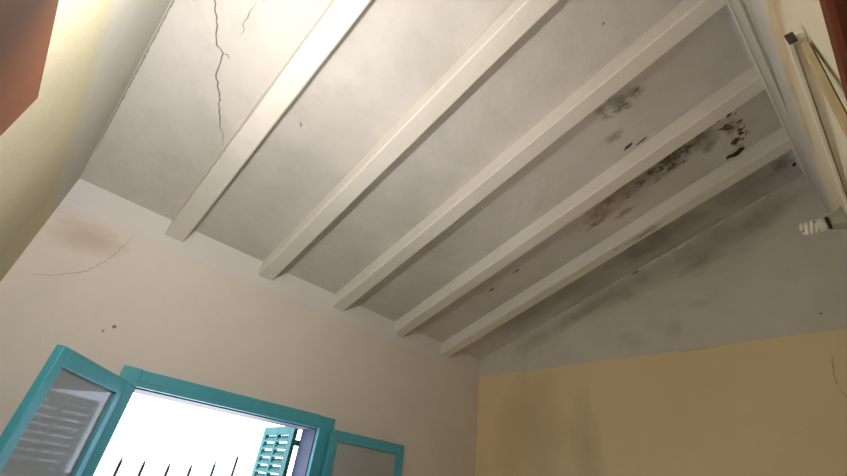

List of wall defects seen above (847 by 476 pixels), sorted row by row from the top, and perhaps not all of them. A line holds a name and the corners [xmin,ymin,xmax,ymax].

crack [95,0,175,151]
crack [214,0,229,145]
water stain [640,145,691,184]